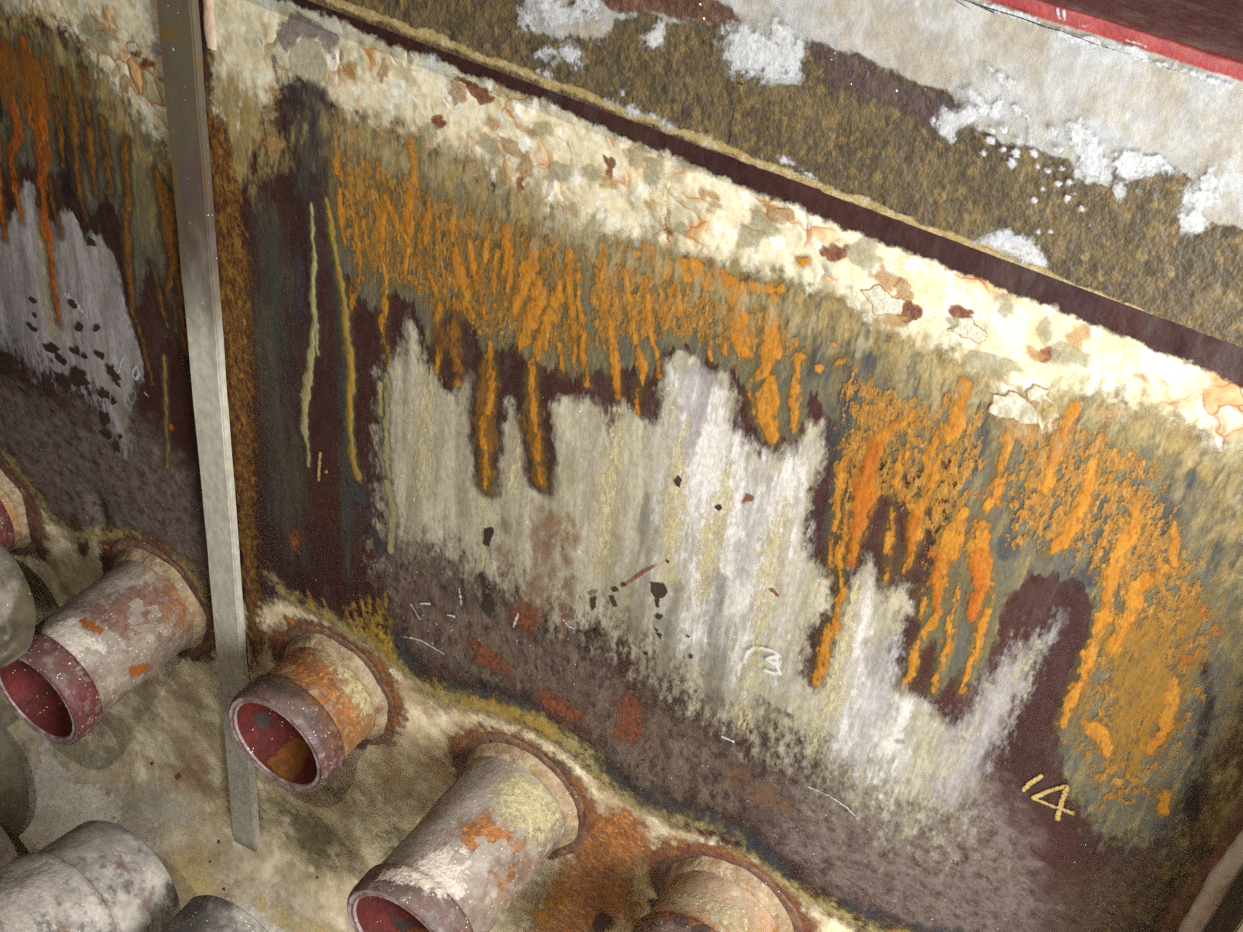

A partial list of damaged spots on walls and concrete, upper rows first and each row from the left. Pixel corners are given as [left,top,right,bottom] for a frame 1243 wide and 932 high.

rust [0,34,155,389]
leakage [0,9,186,469]
rust [149,164,189,358]
rust [206,107,409,749]
peeling [479,573,495,618]
peeling [483,527,494,547]
peeling [588,583,627,609]
peeling [651,582,668,639]
peeling [210,0,1243,483]
leakage [210,74,1243,932]
rust [328,133,1225,832]
rust [448,722,818,932]